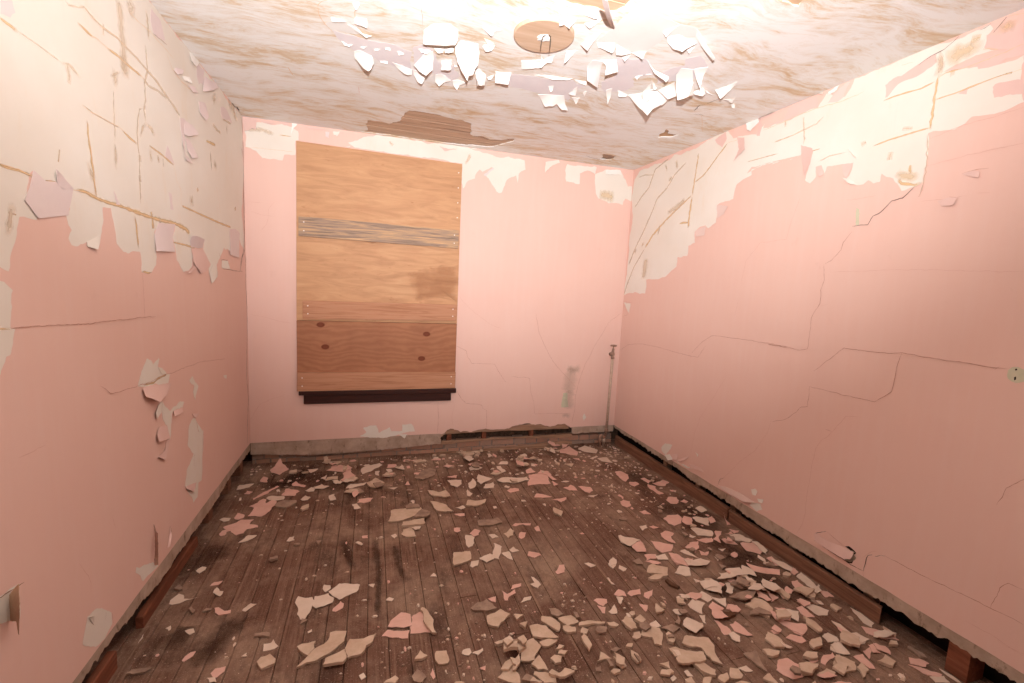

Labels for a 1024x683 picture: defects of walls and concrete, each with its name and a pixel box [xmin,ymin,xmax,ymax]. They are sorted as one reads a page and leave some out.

peeling [318,0,738,115]
peeling [0,0,340,374]
peeling [347,135,526,193]
peeling [565,22,1024,316]
crack [12,275,156,329]
crack [622,143,1022,422]
peeling [138,359,203,503]
peeling [361,424,415,438]
peeling [9,584,20,634]
peeling [83,608,113,647]
crack [858,551,1024,624]